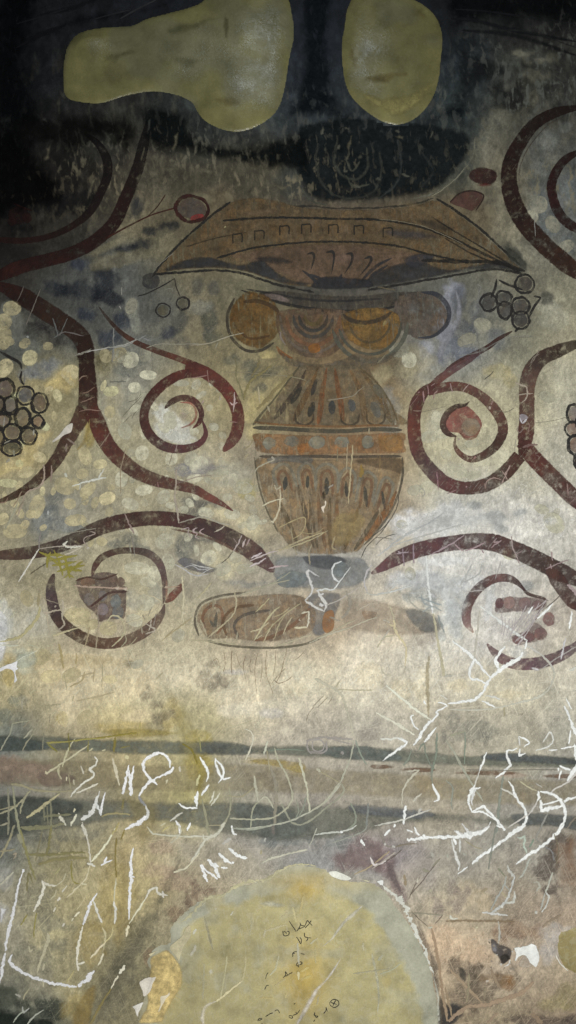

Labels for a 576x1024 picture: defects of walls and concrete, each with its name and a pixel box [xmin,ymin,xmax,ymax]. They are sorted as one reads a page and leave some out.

crack [410,859,443,927]
spalling [133,925,191,1023]
spalling [489,937,539,970]